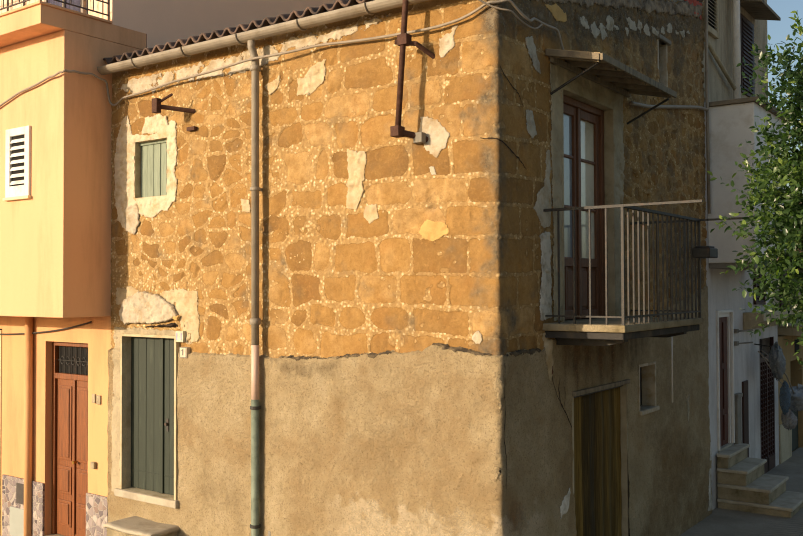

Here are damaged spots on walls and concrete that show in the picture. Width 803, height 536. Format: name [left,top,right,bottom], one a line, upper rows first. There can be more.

crack [482,137,524,166]